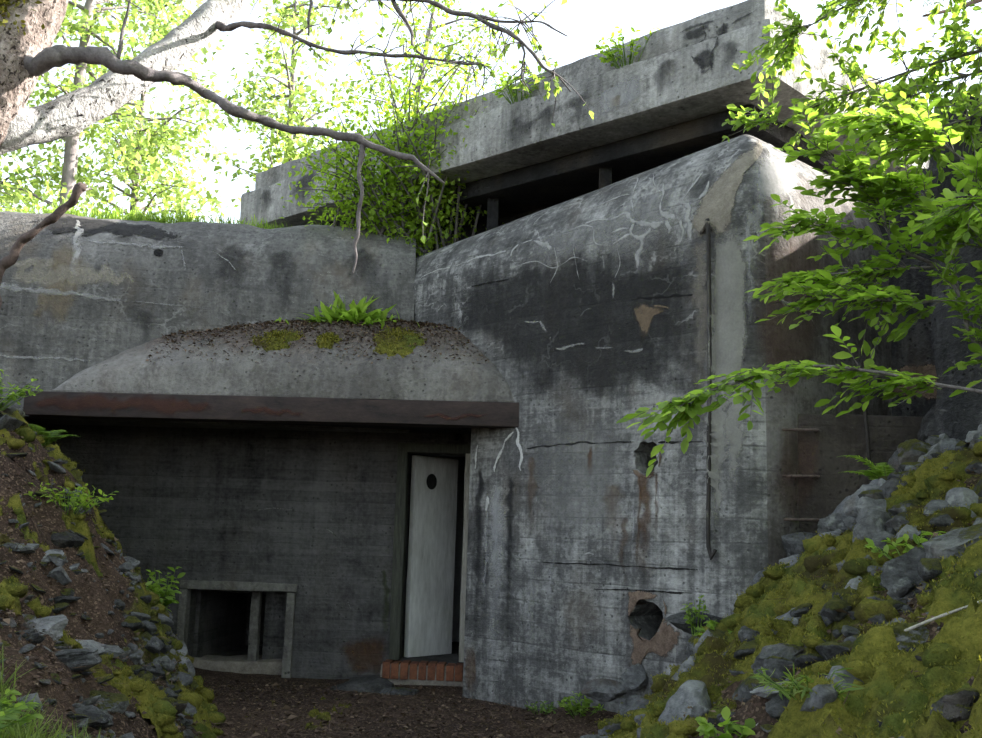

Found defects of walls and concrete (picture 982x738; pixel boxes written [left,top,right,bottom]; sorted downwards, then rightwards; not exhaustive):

crack [421,172,709,287]
water stain [462,258,681,392]
spalling [634,305,669,333]
crack [634,293,692,301]
water stain [693,244,712,358]
peeling [692,140,763,516]
water stain [474,444,514,586]
water stain [493,427,523,472]
rust [637,474,657,534]
spalling [628,591,680,667]